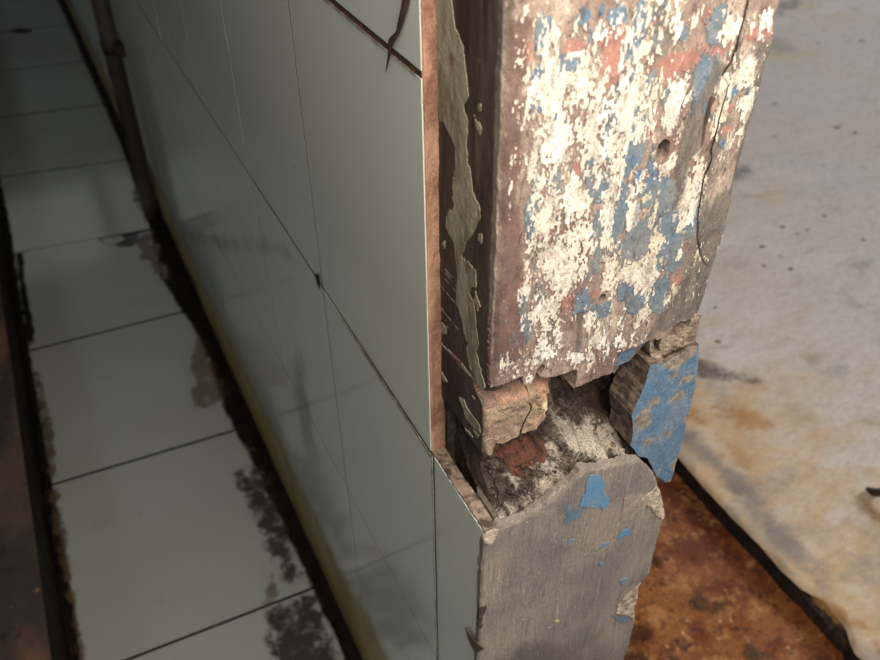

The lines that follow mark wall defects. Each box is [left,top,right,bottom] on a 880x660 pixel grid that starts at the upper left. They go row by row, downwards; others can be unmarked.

crack [697,0,749,264]
damp [58,0,385,660]
peeling [435,0,774,545]
spalling [615,577,641,622]
rust [623,625,653,660]